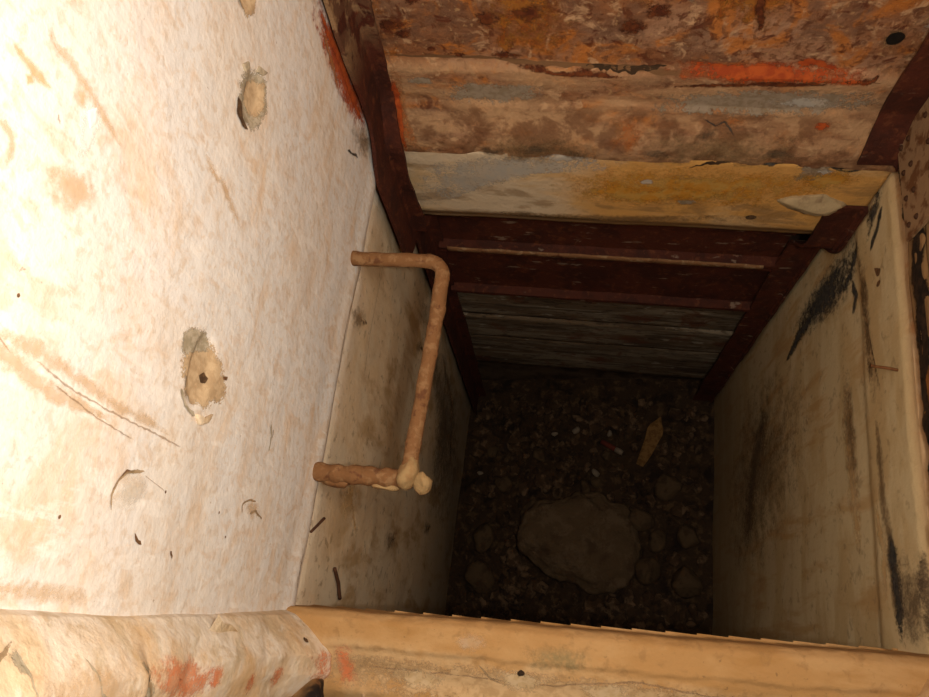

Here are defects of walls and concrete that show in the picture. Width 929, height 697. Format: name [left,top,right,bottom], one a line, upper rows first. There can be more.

spalling [240,0,256,18]
spalling [237,61,268,131]
rust [313,10,368,158]
rust [391,82,416,150]
rust [475,0,618,78]
rust [619,0,672,34]
rust [716,0,782,30]
rust [674,58,866,88]
crack [898,171,929,475]
spalling [180,327,228,425]
leakage [844,391,858,532]
leakage [877,516,929,639]